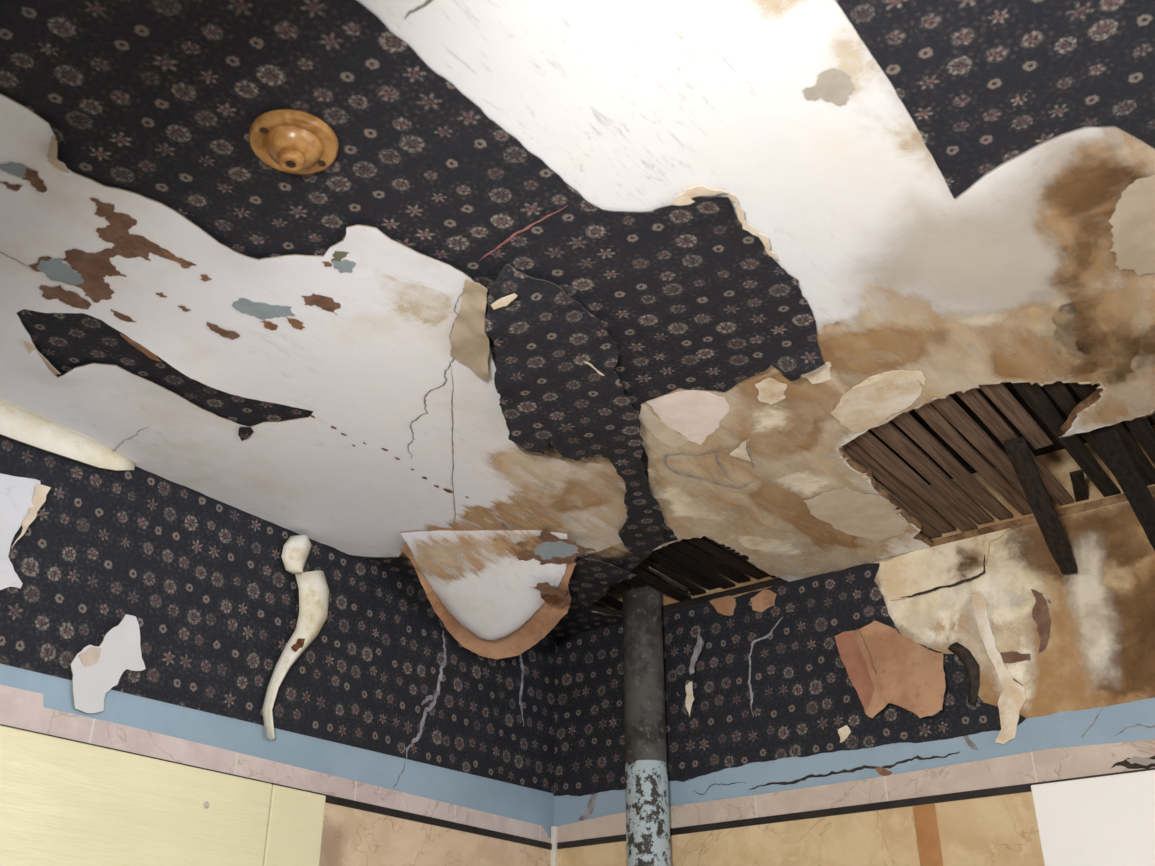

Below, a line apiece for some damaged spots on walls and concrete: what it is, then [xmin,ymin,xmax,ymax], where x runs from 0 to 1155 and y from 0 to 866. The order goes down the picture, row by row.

crack [404,0,433,20]
peeling [29,198,212,322]
peeling [1108,175,1155,276]
peeling [232,298,305,330]
peeling [302,293,341,315]
crack [407,294,462,528]
peeling [638,390,729,450]
peeling [830,370,926,433]
water stain [640,134,1155,707]
peeling [879,528,1011,601]
peeling [262,535,330,741]
crack [693,735,978,795]